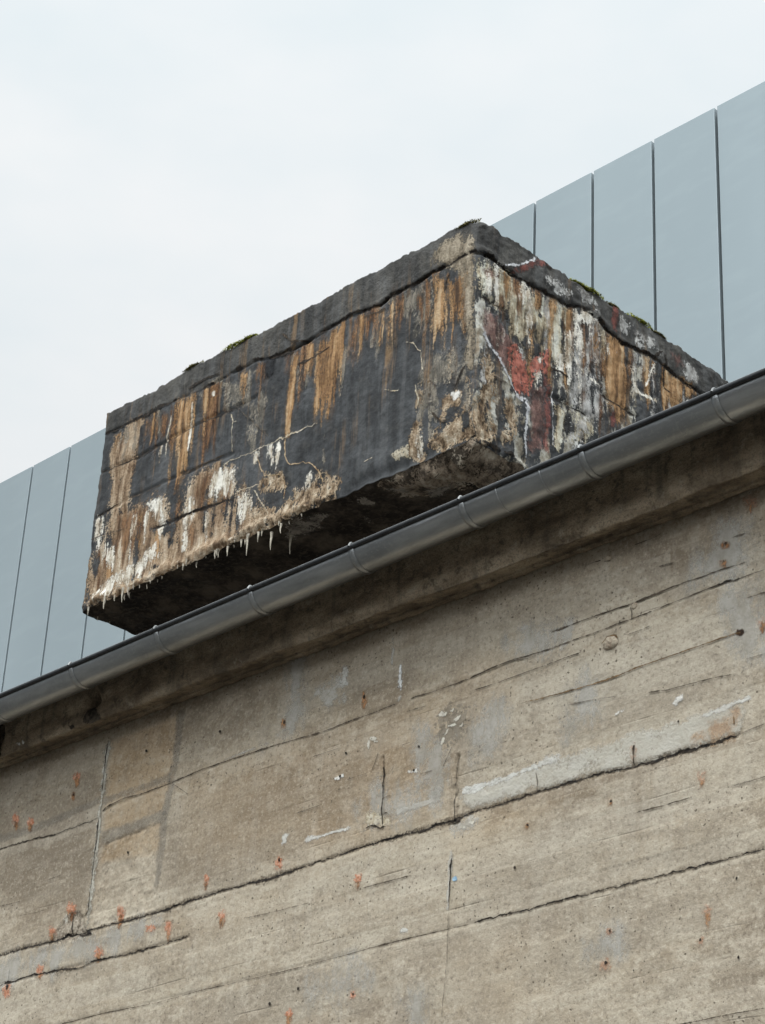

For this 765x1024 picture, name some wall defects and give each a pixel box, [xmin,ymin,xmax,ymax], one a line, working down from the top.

rust [110,383,219,494]
leakage [253,440,281,469]
rust [285,295,404,437]
rust [418,272,467,345]
peeling [390,233,605,463]
rust [499,271,696,431]
peeling [619,315,659,402]
peeling [682,363,699,383]
leakage [87,467,328,623]
leakage [719,591,765,658]
crack [0,562,765,986]
crack [62,849,765,1024]